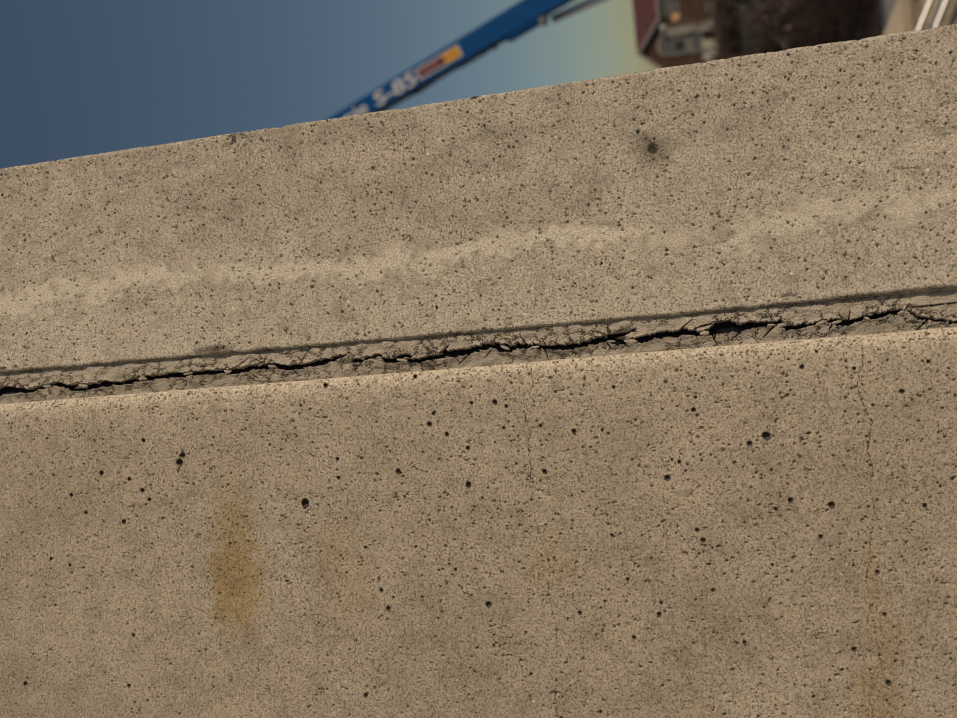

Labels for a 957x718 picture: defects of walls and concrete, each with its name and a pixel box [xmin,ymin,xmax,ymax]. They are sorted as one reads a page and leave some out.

crack [0,302,957,718]